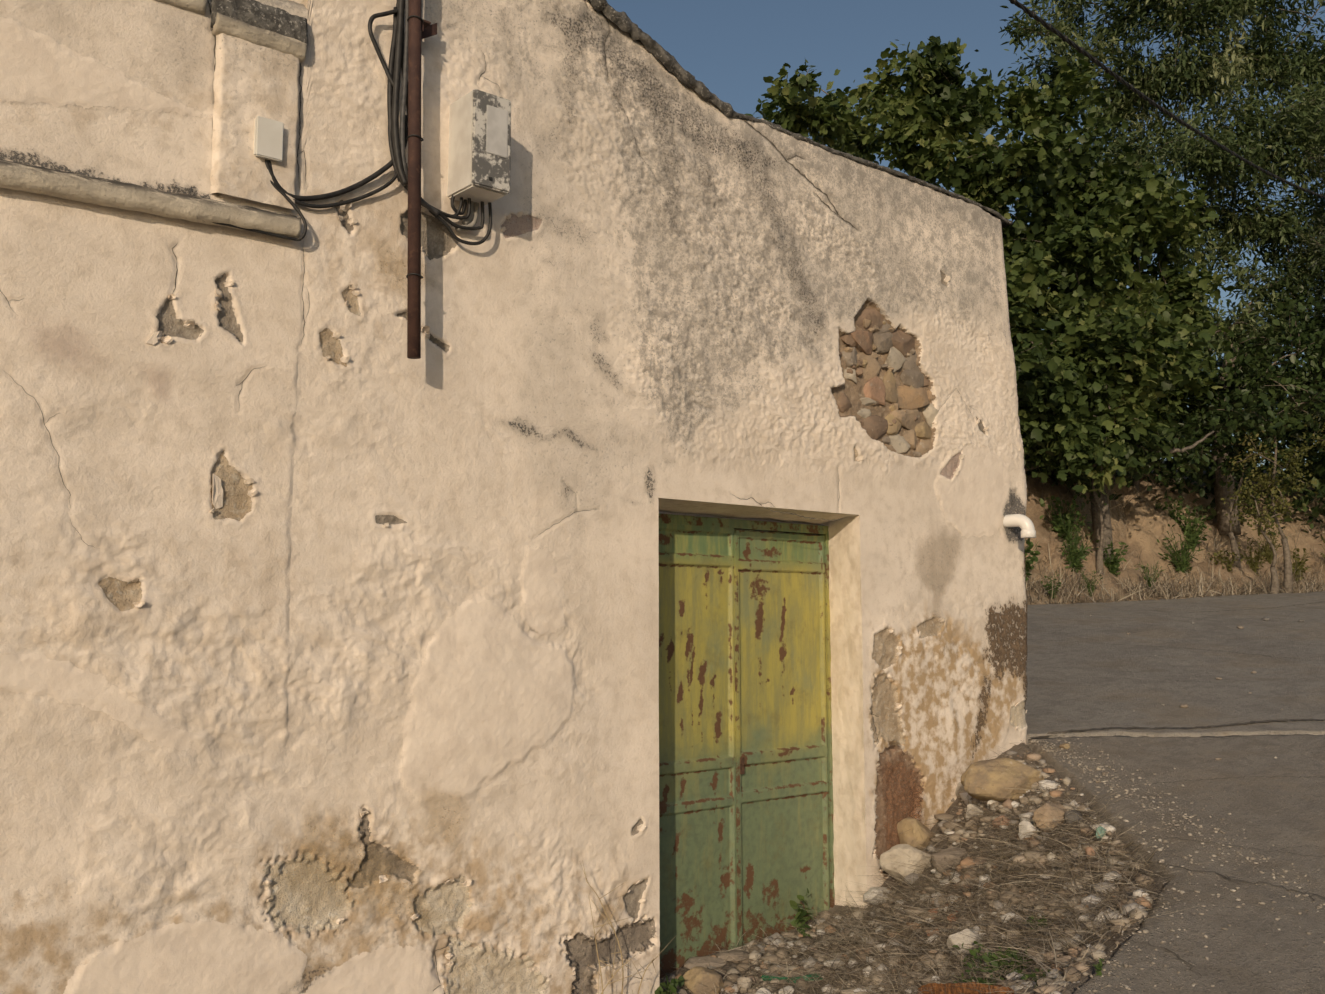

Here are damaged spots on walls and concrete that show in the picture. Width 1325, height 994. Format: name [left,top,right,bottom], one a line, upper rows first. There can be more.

crack [741,118,855,228]
peeling [501,210,542,238]
spalling [146,294,204,345]
spalling [215,273,243,343]
spalling [319,328,350,367]
spalling [831,300,939,457]
spalling [210,450,258,521]
spalling [98,577,145,611]
spalling [917,617,945,638]
spalling [870,628,926,881]
spalling [263,808,549,994]
spalling [559,879,656,994]